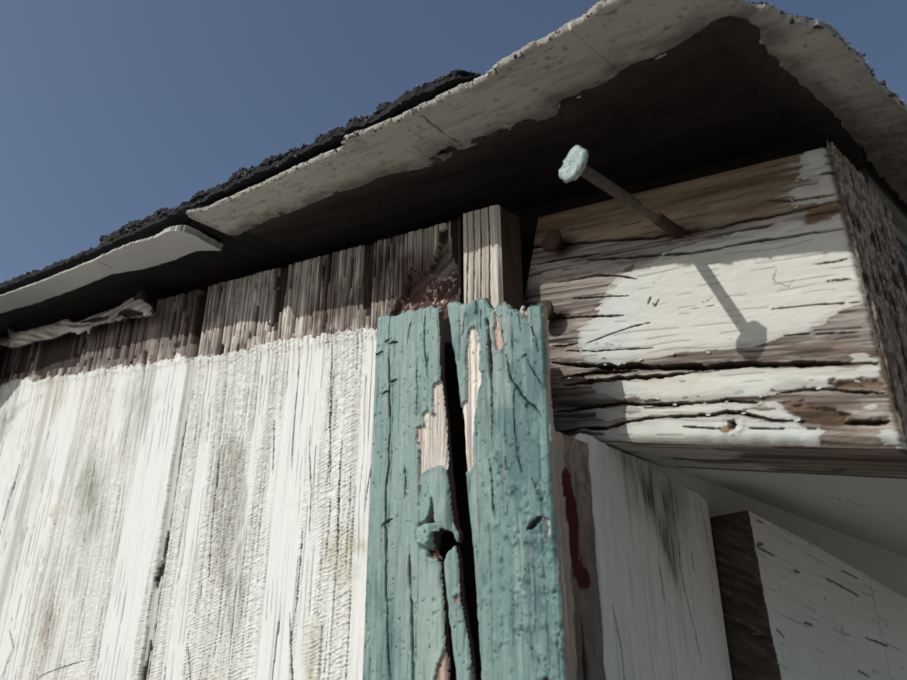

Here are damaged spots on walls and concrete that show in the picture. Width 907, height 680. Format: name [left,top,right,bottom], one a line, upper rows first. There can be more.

peeling [0,218,461,385]
peeling [416,380,450,484]
peeling [461,325,481,471]
peeling [493,311,504,350]
crack [463,186,905,433]
peeling [516,148,902,447]
peeling [434,649,451,680]